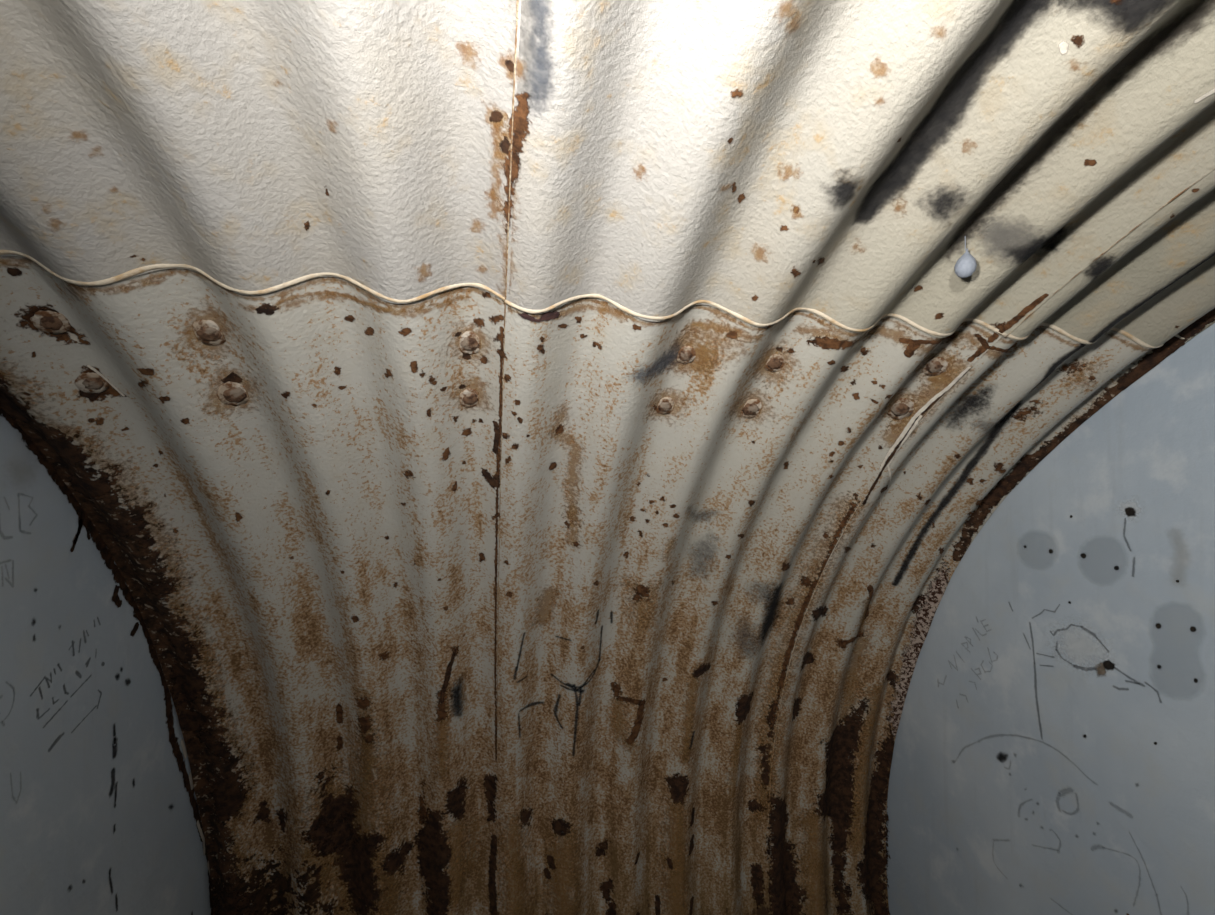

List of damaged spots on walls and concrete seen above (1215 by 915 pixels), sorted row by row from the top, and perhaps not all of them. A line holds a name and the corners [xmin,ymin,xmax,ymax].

rust [0,259,32,276]
rust [66,92,1049,760]
rust [936,308,1215,572]
rust [0,359,499,915]
rust [520,808,533,829]
rust [544,855,556,879]
rust [551,818,573,838]
rust [595,839,611,857]
rust [664,663,711,856]
rust [727,493,898,915]